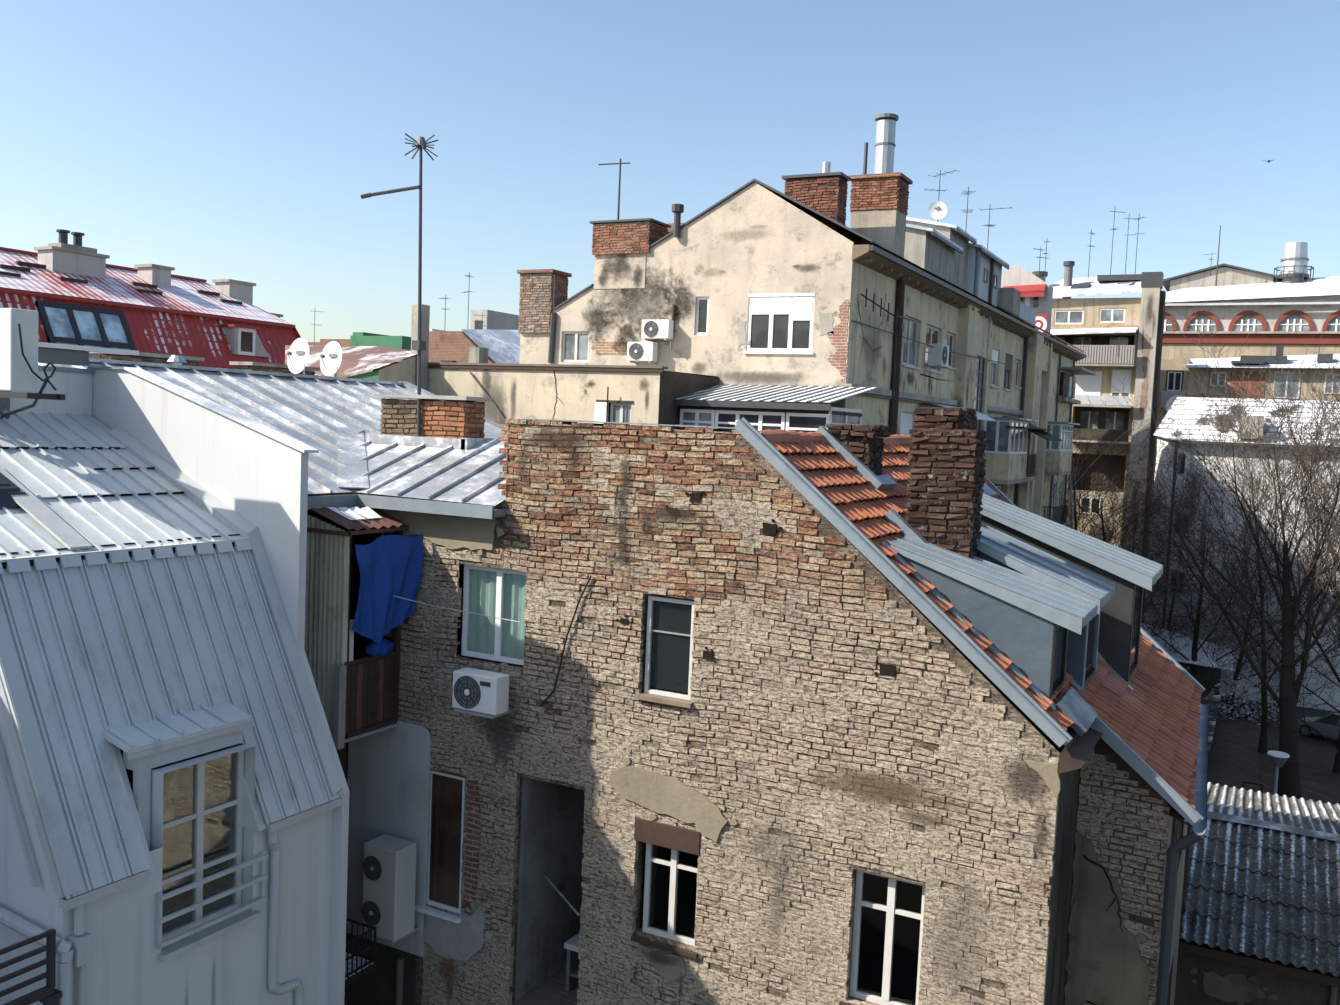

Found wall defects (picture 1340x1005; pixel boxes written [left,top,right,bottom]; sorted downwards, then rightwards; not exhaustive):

mould [588,254,696,346]
peeling [819,300,850,382]
peeling [1064,831,1156,1005]